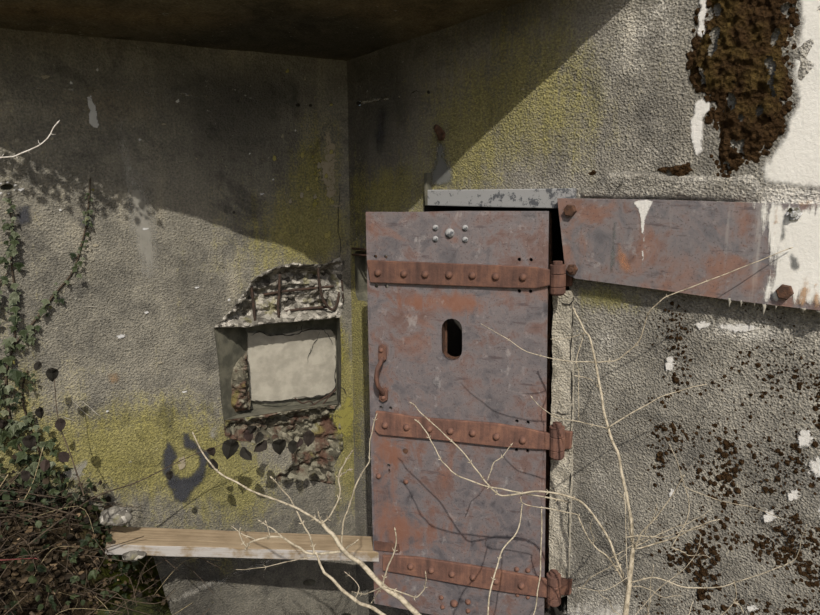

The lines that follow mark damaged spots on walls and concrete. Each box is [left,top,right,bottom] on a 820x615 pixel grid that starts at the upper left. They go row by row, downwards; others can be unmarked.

spalling [214,257,344,328]